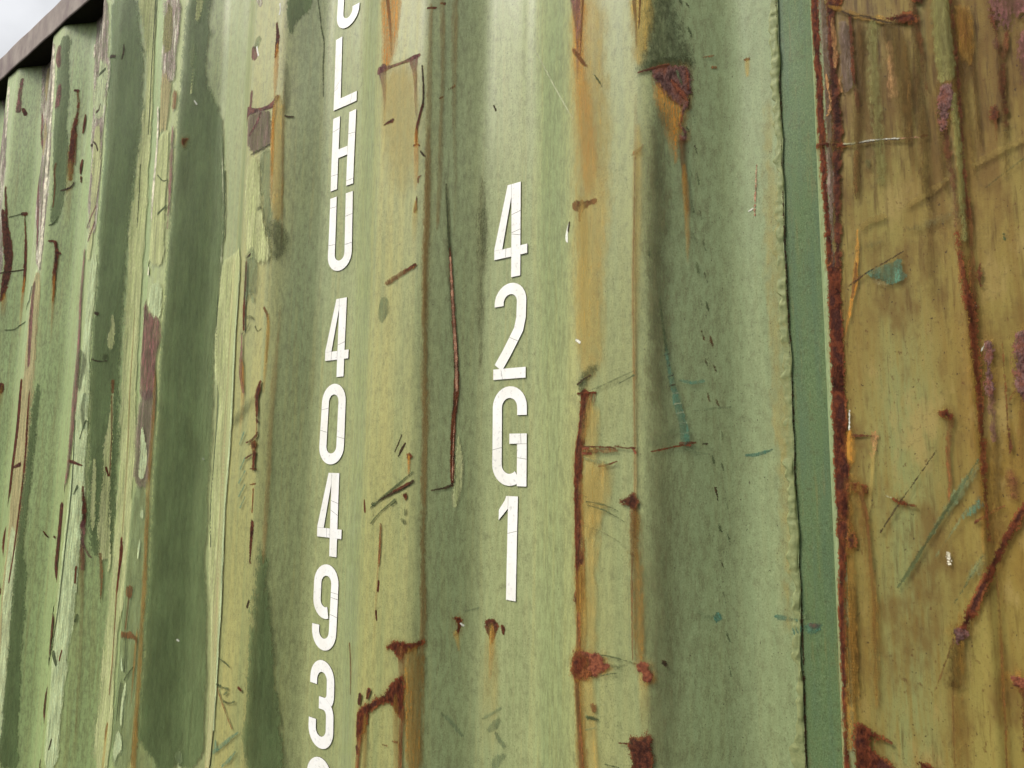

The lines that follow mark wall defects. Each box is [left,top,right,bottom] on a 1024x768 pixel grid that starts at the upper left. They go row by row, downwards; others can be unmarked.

corrosion [377,0,420,91]
peeling [245,90,279,295]
corrosion [810,0,1024,768]
corrosion [570,388,657,768]
corrosion [349,638,425,768]